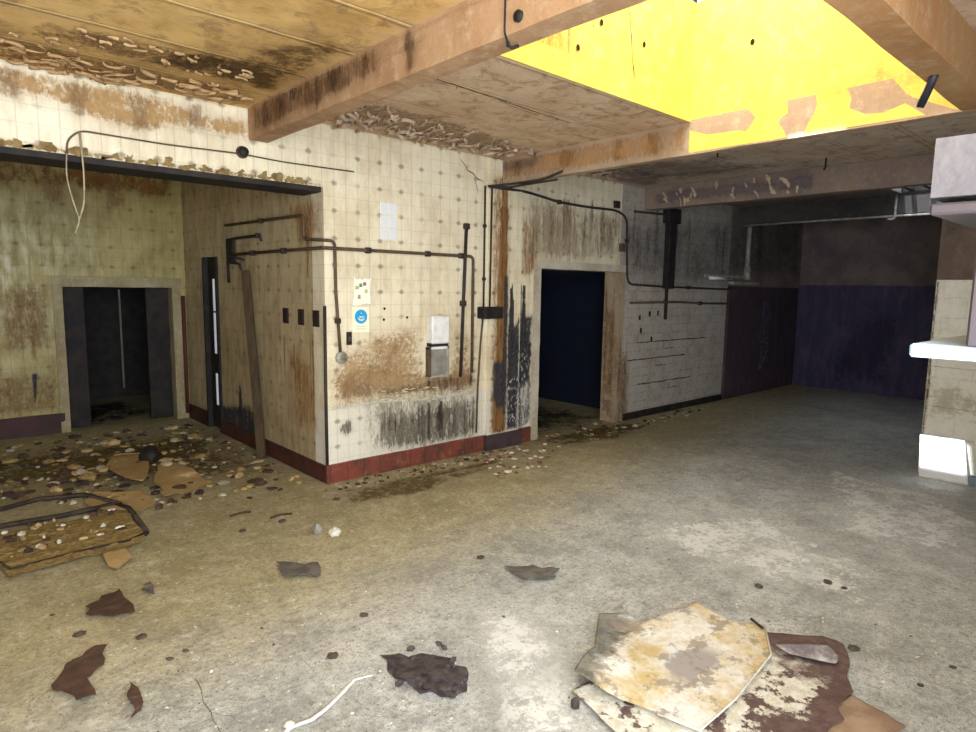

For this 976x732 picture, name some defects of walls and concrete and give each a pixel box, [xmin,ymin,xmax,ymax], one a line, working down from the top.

peeling [0,27,254,104]
peeling [329,104,536,157]
damp [0,163,167,205]
spalling [0,138,310,185]
peeling [581,166,813,207]
damp [529,200,620,260]
damp [508,284,526,379]
damp [337,332,474,448]